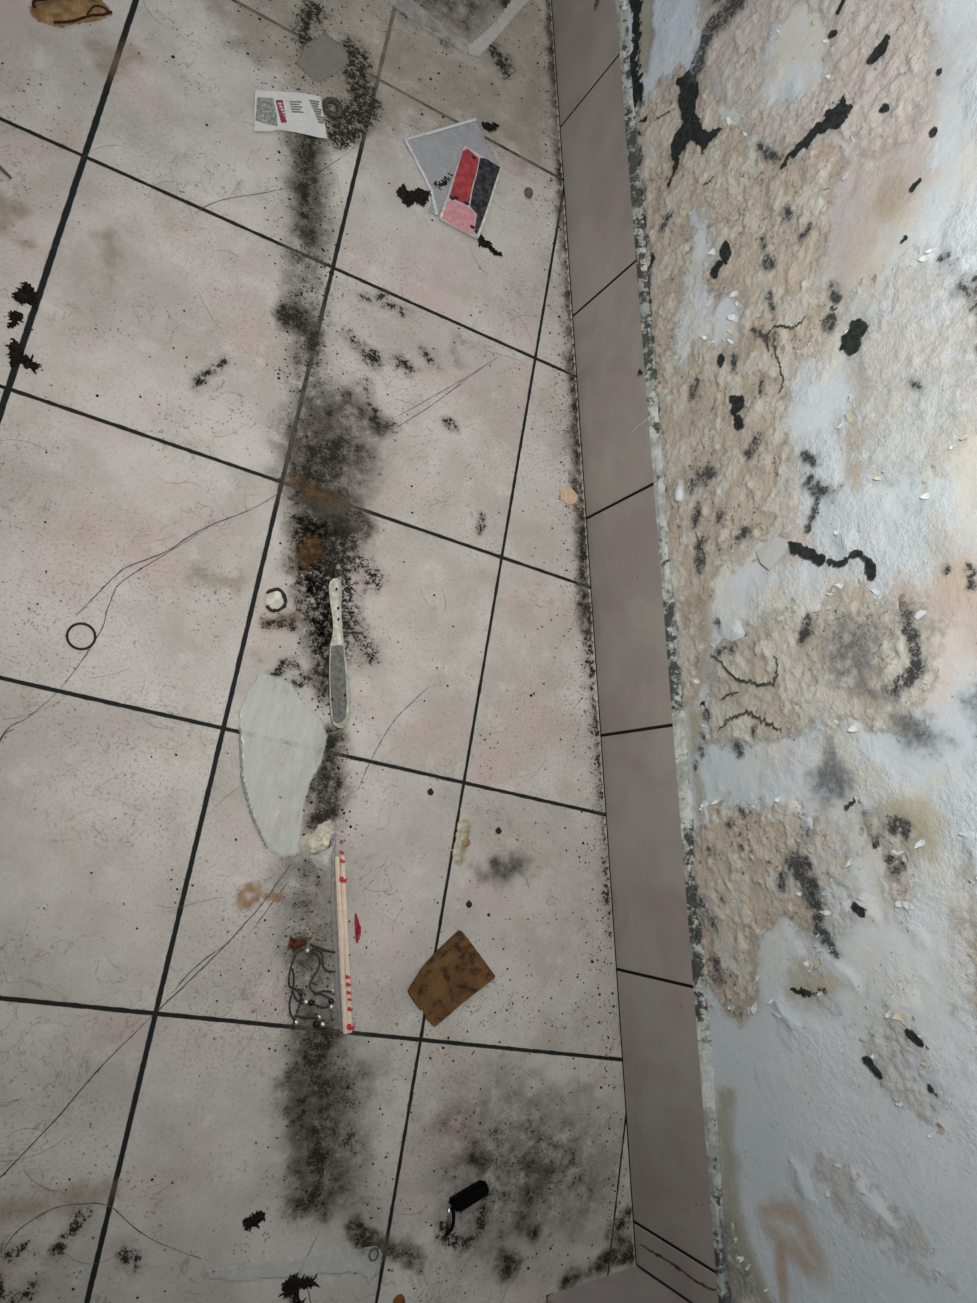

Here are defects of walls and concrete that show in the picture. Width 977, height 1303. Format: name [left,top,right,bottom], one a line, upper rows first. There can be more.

leakage [626,0,673,315]
leakage [667,0,746,188]
leakage [756,93,853,170]
leakage [260,38,440,701]
leakage [546,0,612,943]
peeling [635,0,977,756]
leakage [787,450,877,580]
leakage [822,280,869,355]
peeling [693,797,925,1022]
leakage [275,859,422,1275]
peeling [860,1013,949,1138]
crack [641,1245,717,1291]